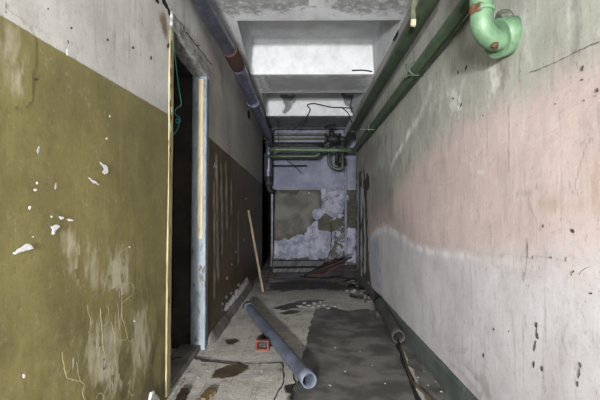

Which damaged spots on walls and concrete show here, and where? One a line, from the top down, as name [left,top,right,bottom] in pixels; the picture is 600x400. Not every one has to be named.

rust [222,43,245,72]
crack [520,41,600,73]
water stain [212,91,239,305]
peeling [273,169,371,286]